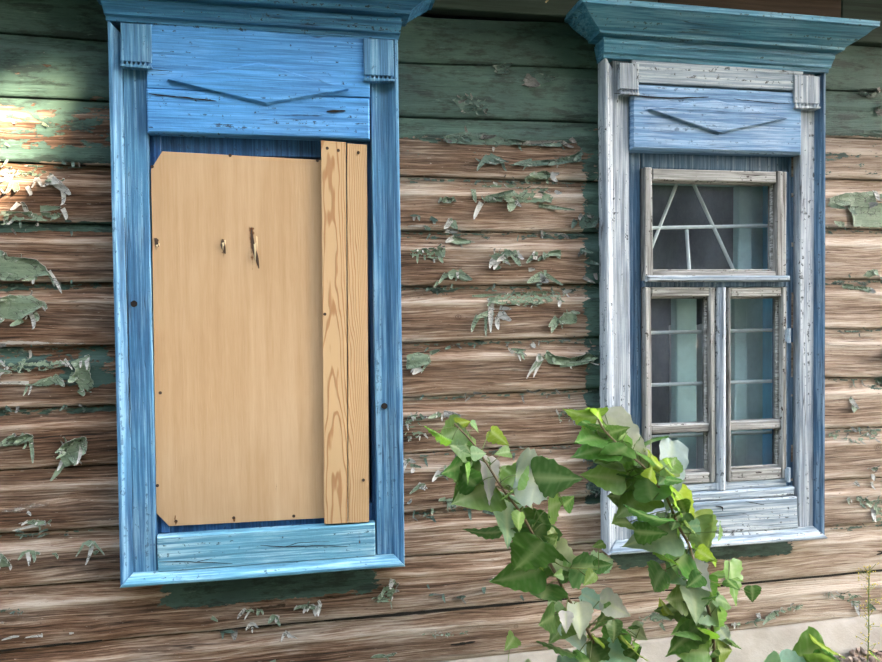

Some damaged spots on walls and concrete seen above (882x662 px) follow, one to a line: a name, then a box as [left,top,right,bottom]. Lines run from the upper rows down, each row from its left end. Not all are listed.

peeling [828,190,882,234]
peeling [406,126,600,378]
peeling [0,250,82,329]
peeling [0,343,94,413]
peeling [828,377,882,413]
peeling [0,433,34,464]
peeling [50,437,87,481]
peeling [830,466,882,531]
peeling [12,511,52,539]
peeling [0,550,40,570]
peeling [211,608,297,642]
peeling [294,600,322,617]